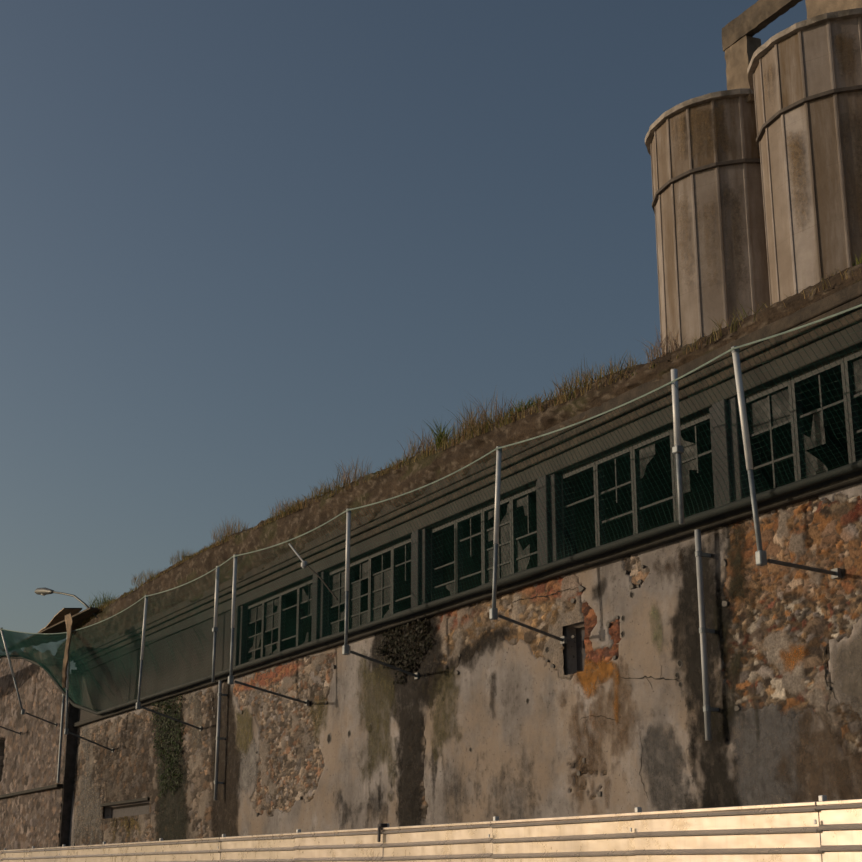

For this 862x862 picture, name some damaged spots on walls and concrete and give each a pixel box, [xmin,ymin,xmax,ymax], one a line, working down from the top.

spalling [233,652,337,817]
water stain [367,616,512,826]
spalling [427,574,625,688]
crack [621,666,683,687]
water stain [642,524,862,815]
spalling [720,493,862,761]